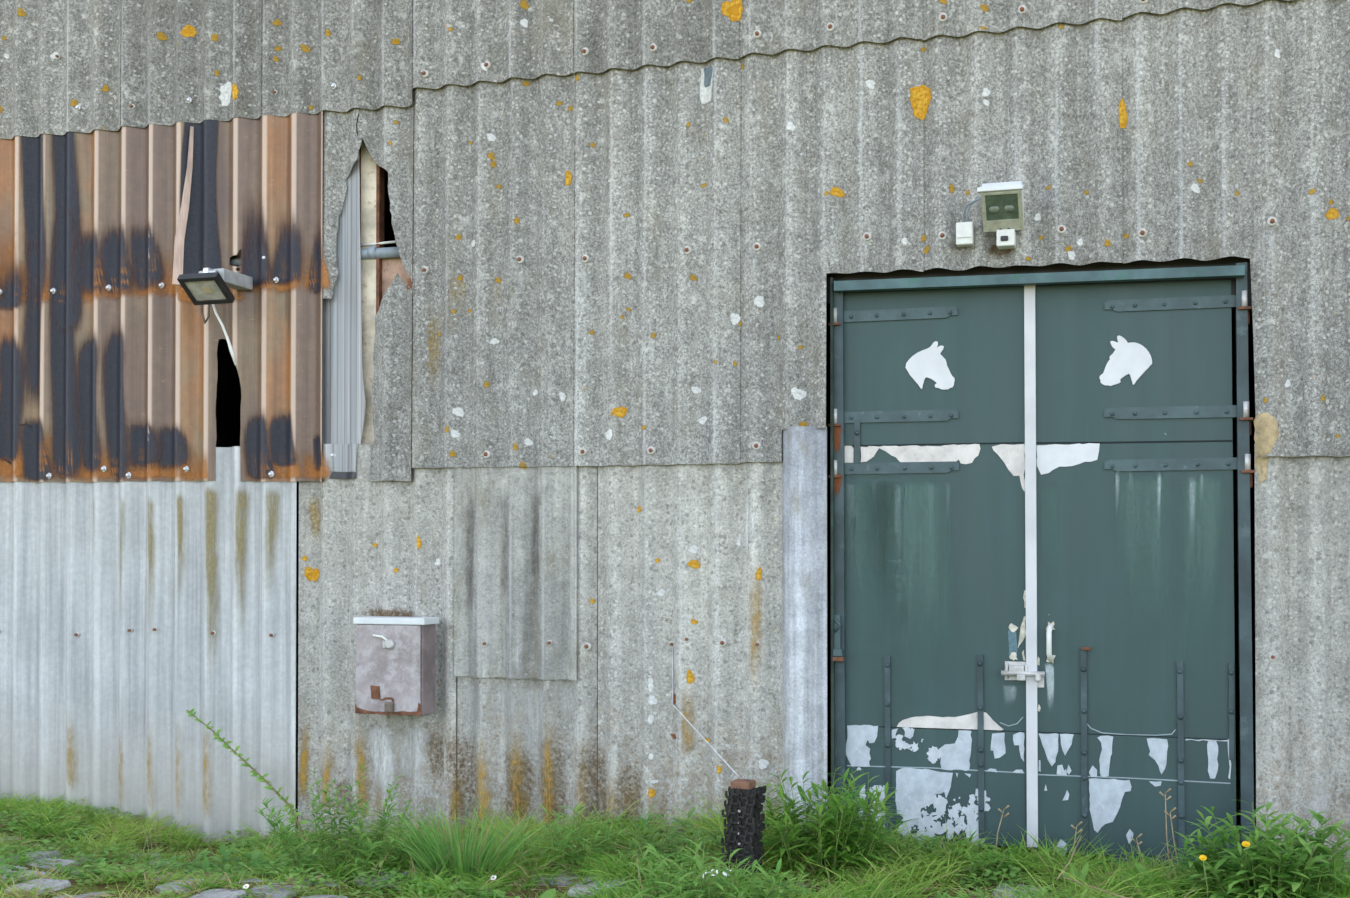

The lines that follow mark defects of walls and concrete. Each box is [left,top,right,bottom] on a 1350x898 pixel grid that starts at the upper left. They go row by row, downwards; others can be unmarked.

peeling [845,443,1100,492]
water stain [300,728,489,821]
water stain [506,693,659,824]
peeling [846,712,1074,845]
peeling [1089,736,1131,833]
peeling [1147,738,1168,786]
peeling [1186,739,1231,779]